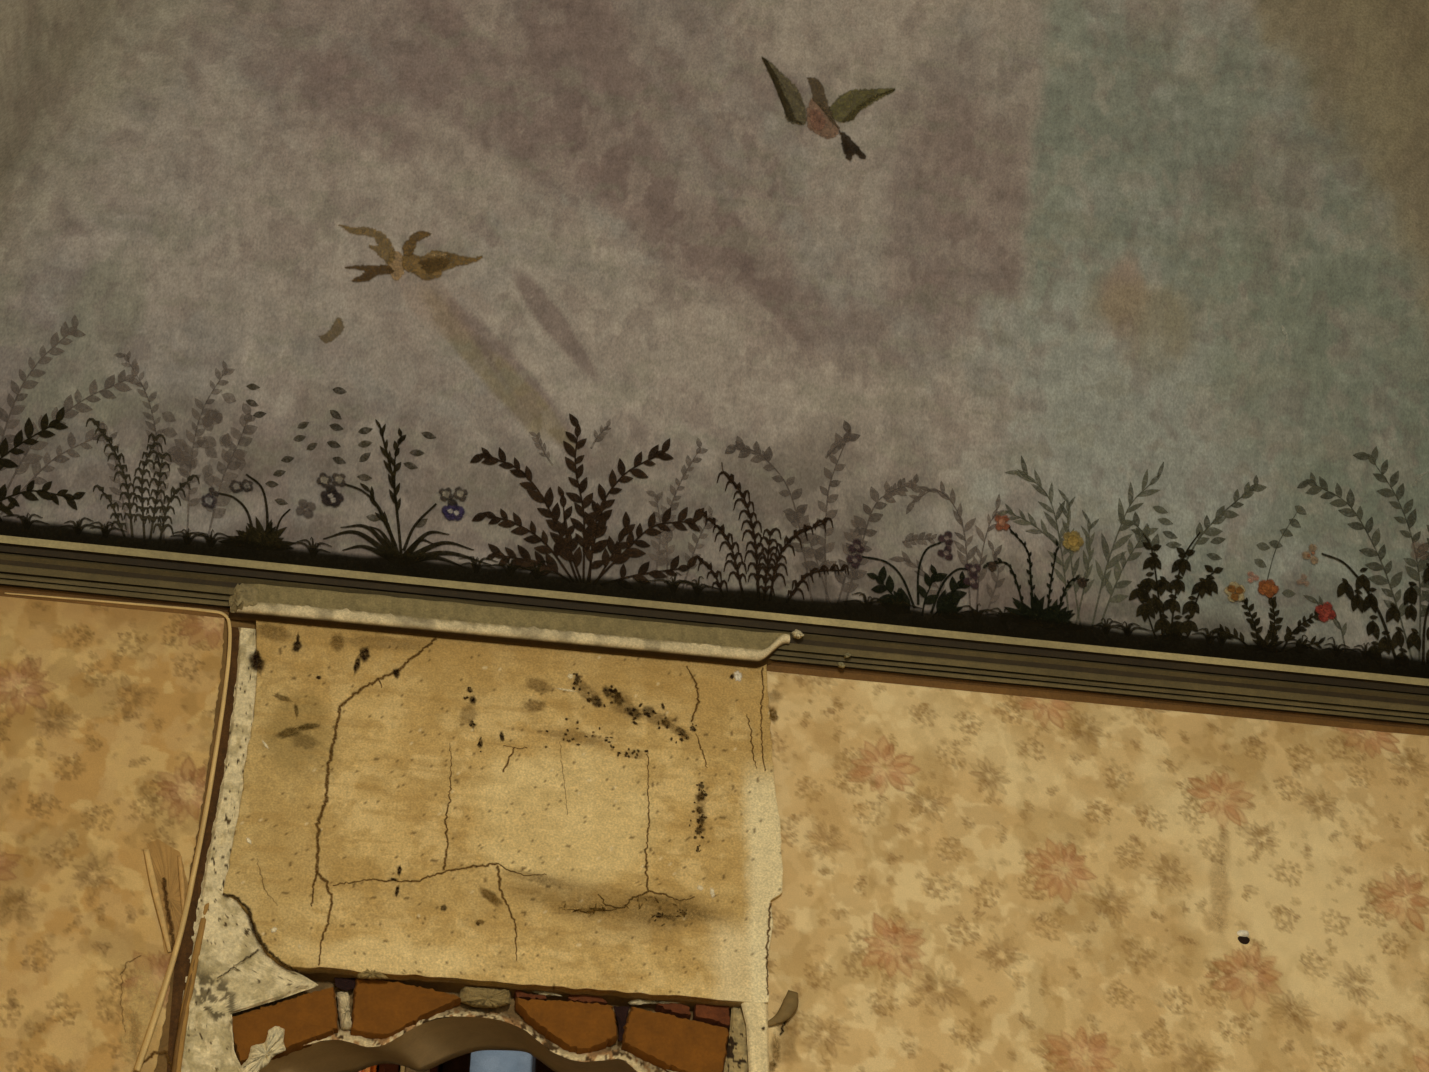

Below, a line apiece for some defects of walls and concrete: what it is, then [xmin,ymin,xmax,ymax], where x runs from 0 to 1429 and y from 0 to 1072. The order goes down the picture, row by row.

crack [217,638,546,979]
flaking render [4,592,799,1072]
crack [503,745,568,814]
damp [545,718,648,759]
crack [561,753,695,913]
damp [572,673,697,743]
crack [687,666,708,768]
damp [689,782,708,852]